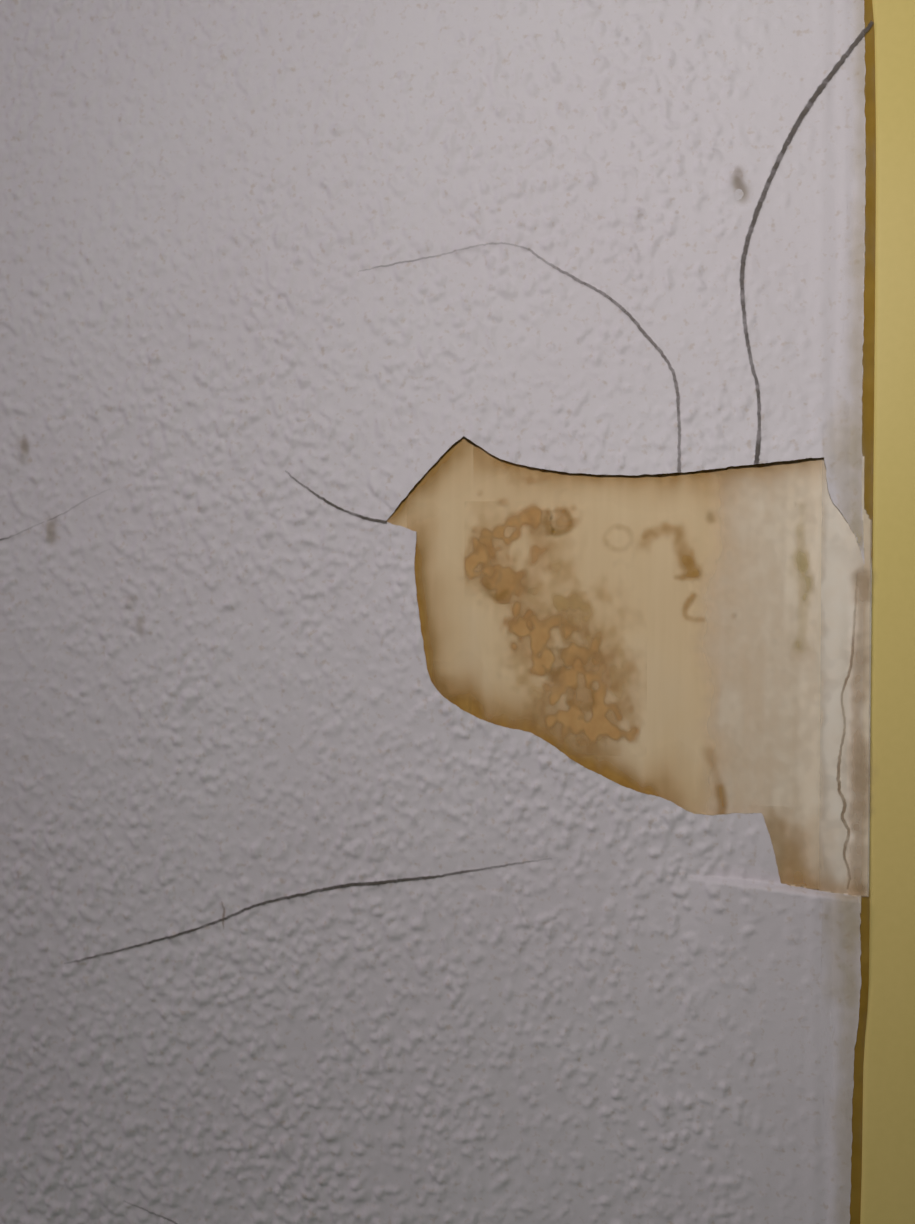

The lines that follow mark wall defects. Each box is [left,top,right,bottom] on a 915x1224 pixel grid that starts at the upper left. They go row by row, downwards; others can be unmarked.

crack [740,20,874,464]
crack [559,270,681,472]
crack [295,479,387,524]
damp [390,441,460,518]
damp [415,506,659,796]
peeling [387,436,871,913]
damp [682,555,699,578]
crack [83,868,483,960]